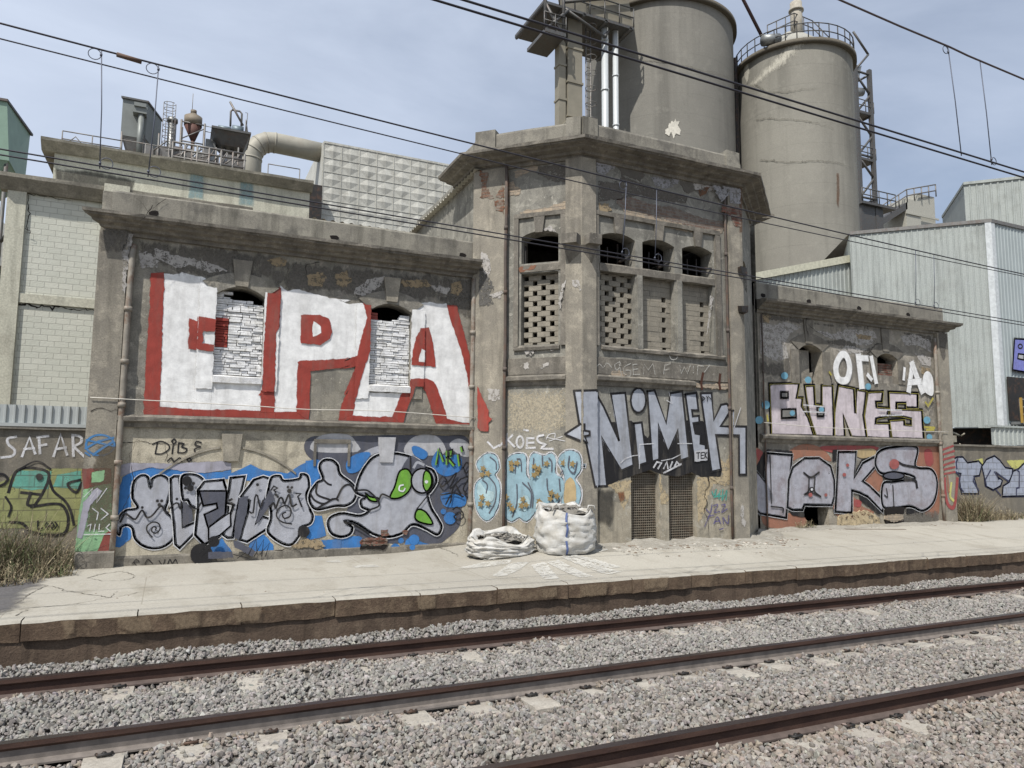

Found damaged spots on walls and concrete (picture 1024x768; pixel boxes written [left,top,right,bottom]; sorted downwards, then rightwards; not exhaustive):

peeling [665,119,681,138]
flaking render [479,164,565,214]
flaking render [596,162,742,233]
flaking render [121,234,227,293]
flaking render [307,270,384,296]
flaking render [401,279,463,296]
flaking render [760,315,801,361]
flaking render [816,329,877,354]
flaking render [900,334,931,375]